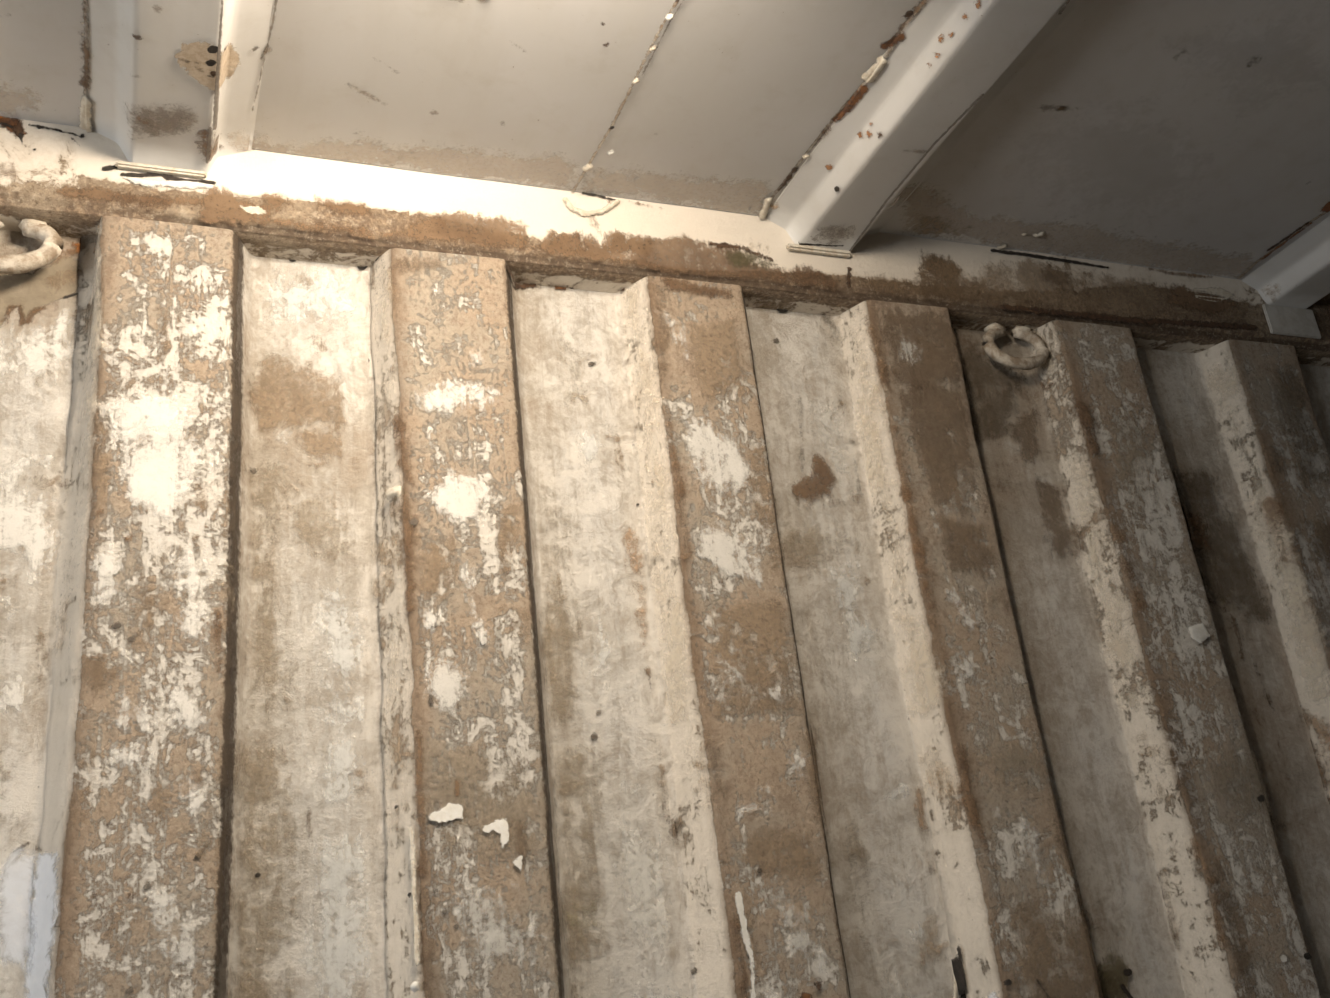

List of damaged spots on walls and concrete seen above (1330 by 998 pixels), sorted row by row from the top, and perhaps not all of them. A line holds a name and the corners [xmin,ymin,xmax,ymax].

rust [880,0,926,49]
rust [0,116,27,138]
rust [814,85,869,146]
rust [770,167,798,208]
water stain [799,94,984,252]
water stain [0,257,79,327]
water stain [506,265,536,289]
peeling [87,386,219,517]
peeling [432,470,490,524]
peeling [414,730,463,874]
peeling [482,818,509,848]
peeling [952,946,967,998]